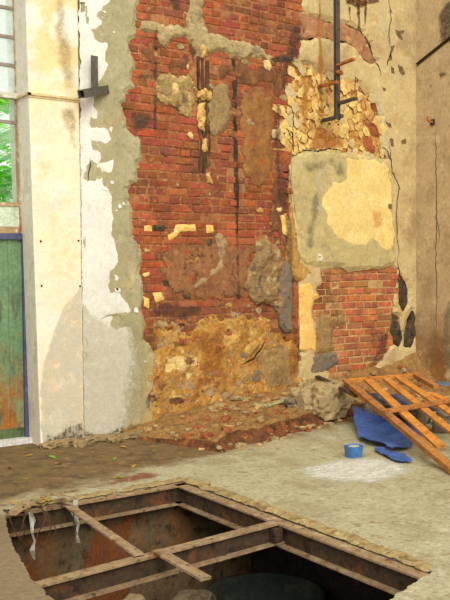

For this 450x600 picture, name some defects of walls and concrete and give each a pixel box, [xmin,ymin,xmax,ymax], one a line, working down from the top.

crack [357,3,392,72]
flaking render [78,0,416,437]
crack [433,133,441,324]
rust [85,535,126,569]